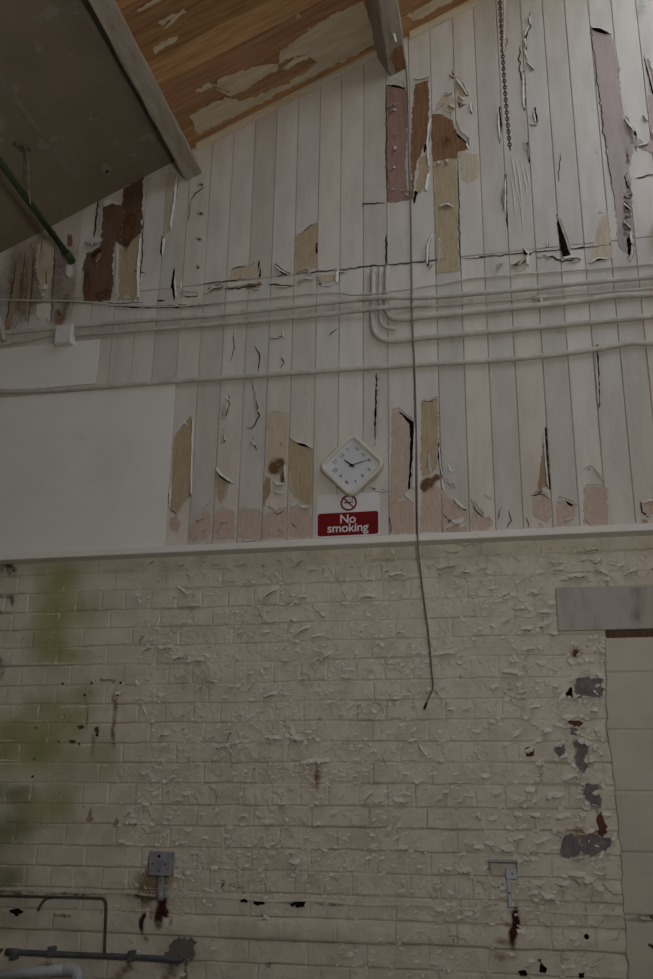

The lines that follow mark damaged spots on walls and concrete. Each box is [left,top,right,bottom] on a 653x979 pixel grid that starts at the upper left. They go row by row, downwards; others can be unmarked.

peeling [153,9,187,55]
peeling [190,2,374,135]
peeling [385,71,480,274]
peeling [496,13,653,273]
peeling [5,228,56,330]
peeling [81,177,147,302]
peeling [168,415,235,541]
peeling [525,427,609,528]
spalling [443,714,613,874]
rust [139,898,171,940]
rust [507,907,520,946]
spalling [518,959,547,976]